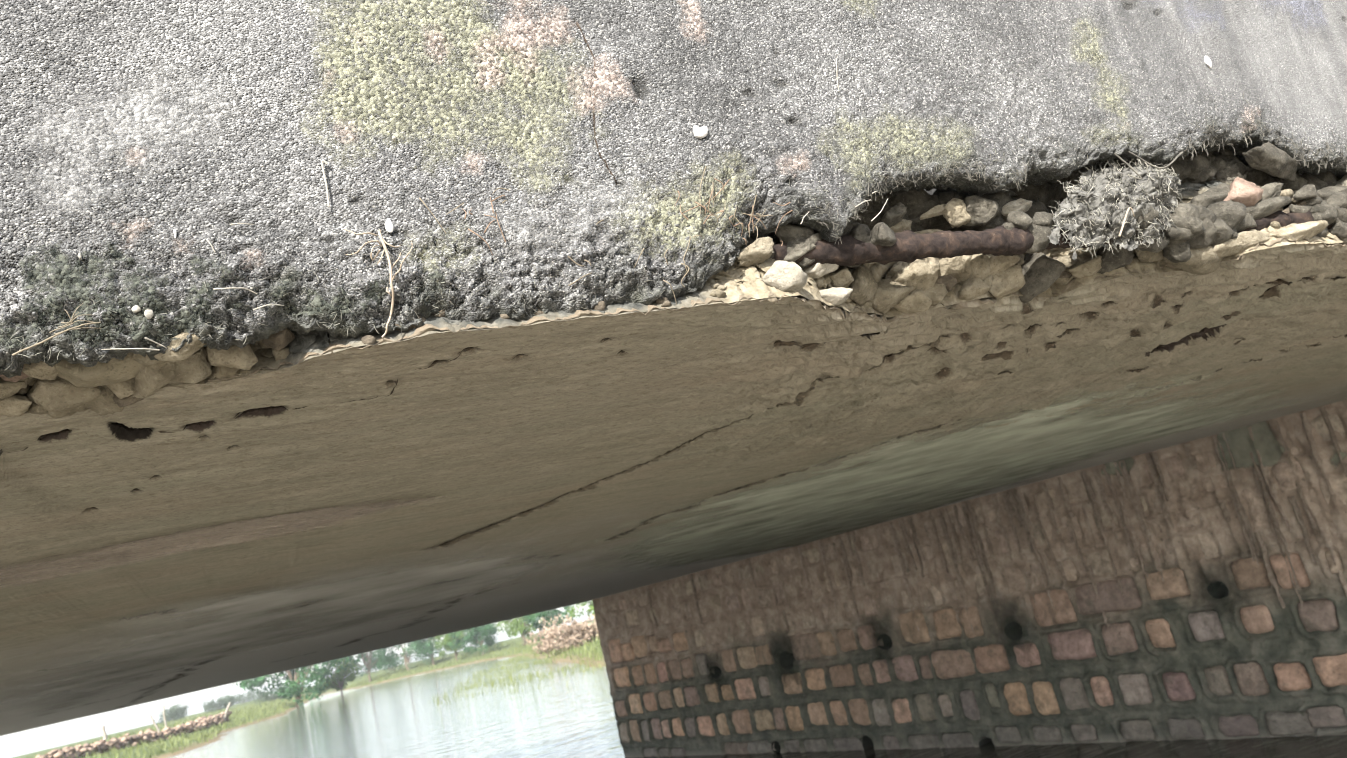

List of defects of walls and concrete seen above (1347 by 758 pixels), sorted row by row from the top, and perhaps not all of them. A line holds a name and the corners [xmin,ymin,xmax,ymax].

water stain [502,0,564,56]
spalling [0,142,1347,419]